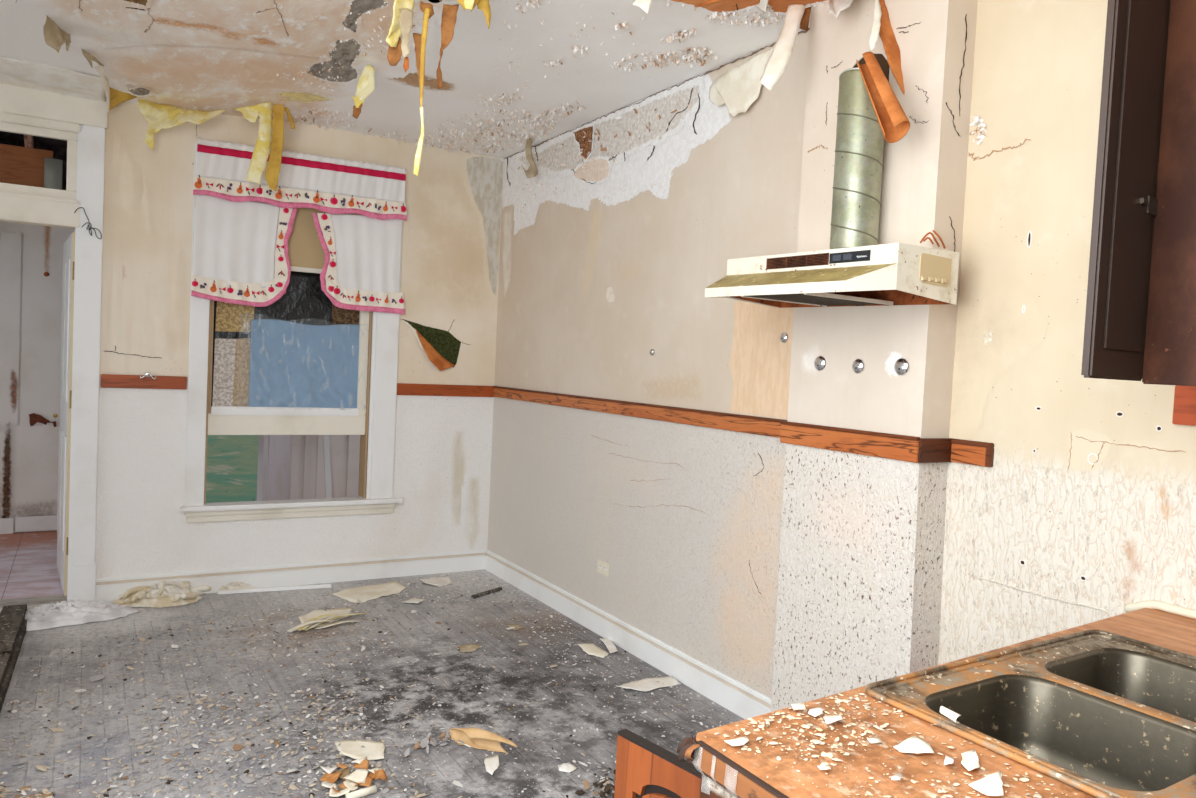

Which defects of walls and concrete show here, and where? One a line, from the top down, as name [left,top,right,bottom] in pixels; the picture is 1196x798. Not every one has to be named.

peeling [118,0,153,8]
peeling [123,85,154,97]
flaking render [277,0,853,252]
crack [909,14,1031,161]
leakage [445,424,486,550]
crack [1067,432,1185,473]